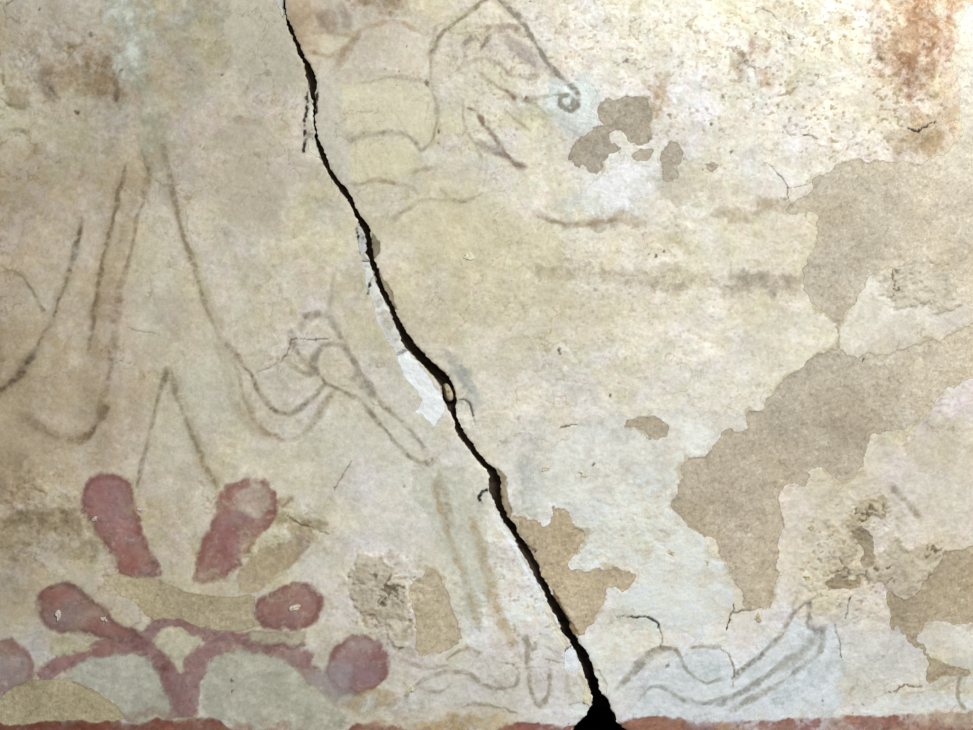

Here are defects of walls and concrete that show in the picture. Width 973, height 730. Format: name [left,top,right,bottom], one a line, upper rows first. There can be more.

spalling [569,96,683,181]
crack [274,0,611,710]
spalling [671,4,973,622]
spalling [624,416,669,440]
spalling [353,554,461,656]
spalling [511,506,636,635]
spalling [825,495,973,683]